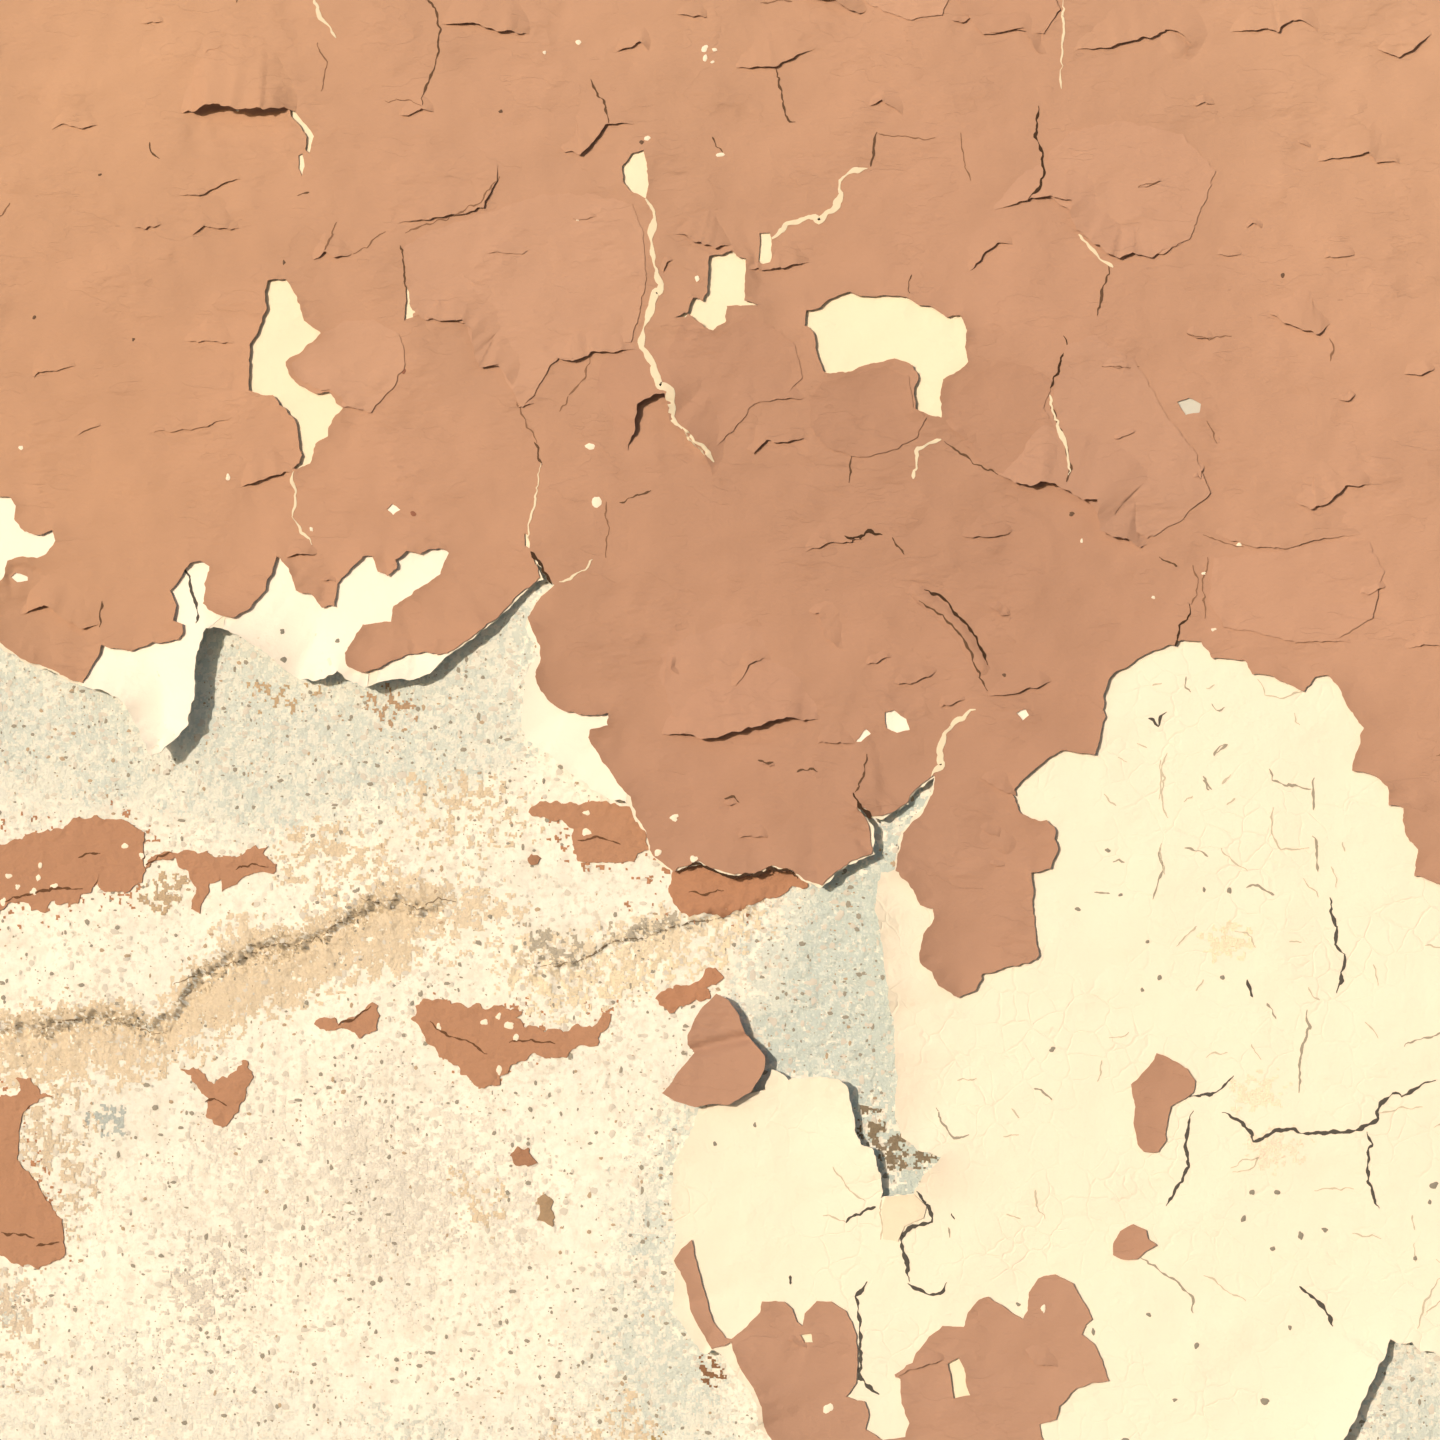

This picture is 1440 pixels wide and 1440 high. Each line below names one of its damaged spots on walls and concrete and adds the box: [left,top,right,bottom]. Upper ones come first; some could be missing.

peeling [241,150,802,487]
crack [638,199,714,462]
peeling [805,292,968,417]
peeling [0,497,100,629]
peeling [82,548,449,756]
peeling [521,623,627,802]
crack [920,590,988,777]
crack [1118,535,1378,1091]
peeling [662,640,1440,1440]
crack [823,1167,955,1296]
crack [1166,1044,1440,1329]
crack [855,1282,879,1395]